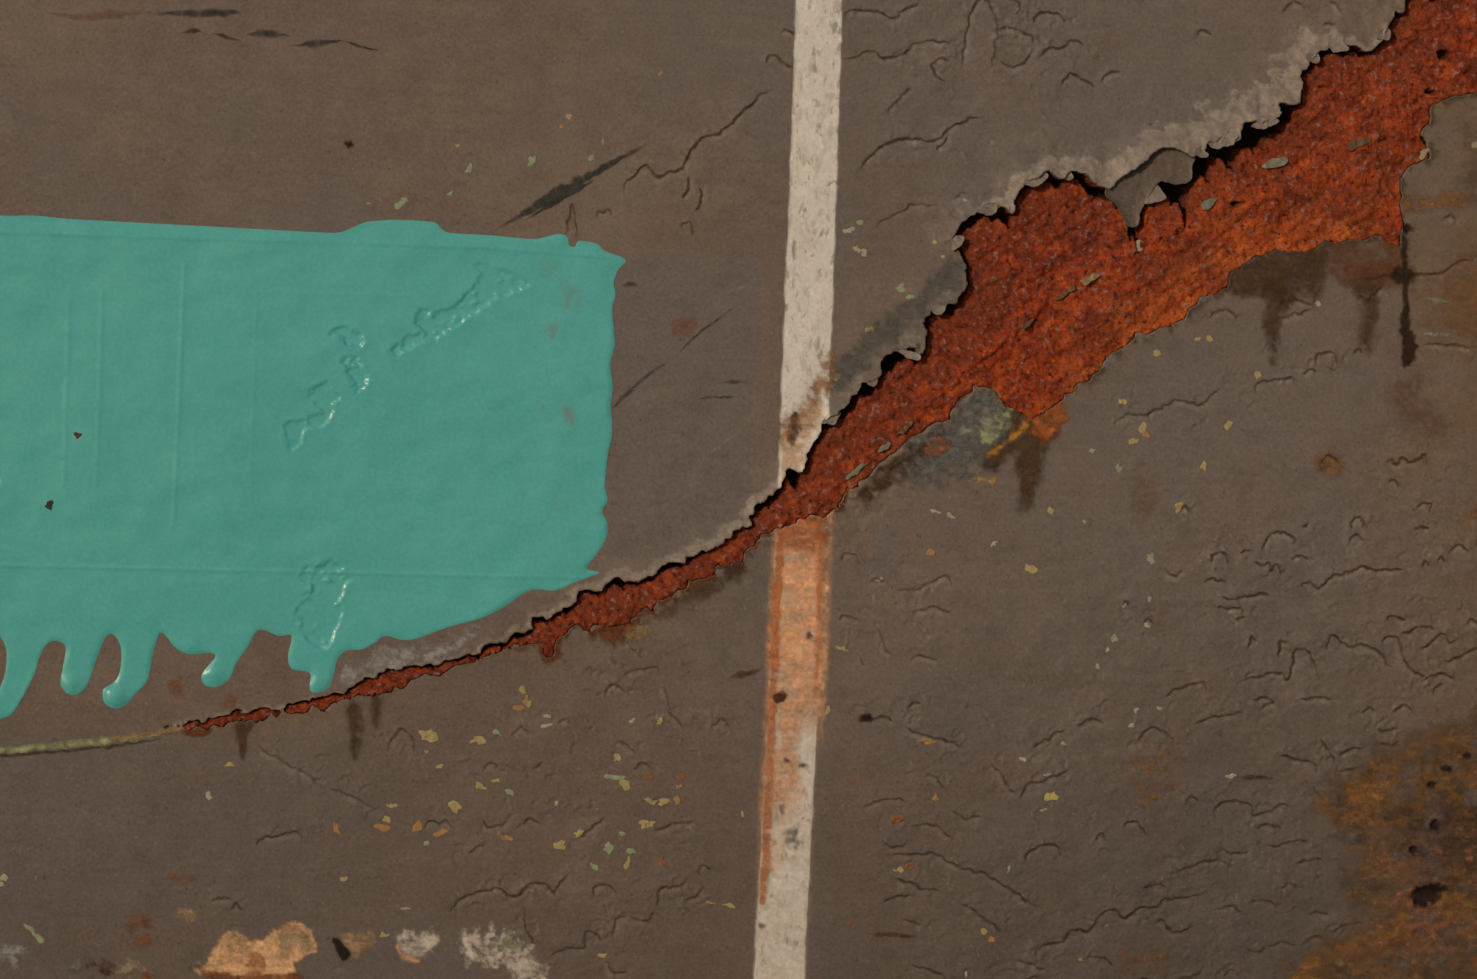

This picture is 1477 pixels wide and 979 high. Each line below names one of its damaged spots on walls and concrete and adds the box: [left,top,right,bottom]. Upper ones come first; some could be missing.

crack [850,0,1115,86]
crack [631,102,754,198]
crack [862,117,975,165]
corrosion [178,0,1477,736]
peeling [340,624,527,684]
crack [1172,503,1471,744]
corrosion [236,722,252,757]
peeling [419,729,444,769]
spalling [773,693,787,703]
corrosion [760,515,830,904]
peeling [590,753,686,871]
peeling [1040,773,1059,812]